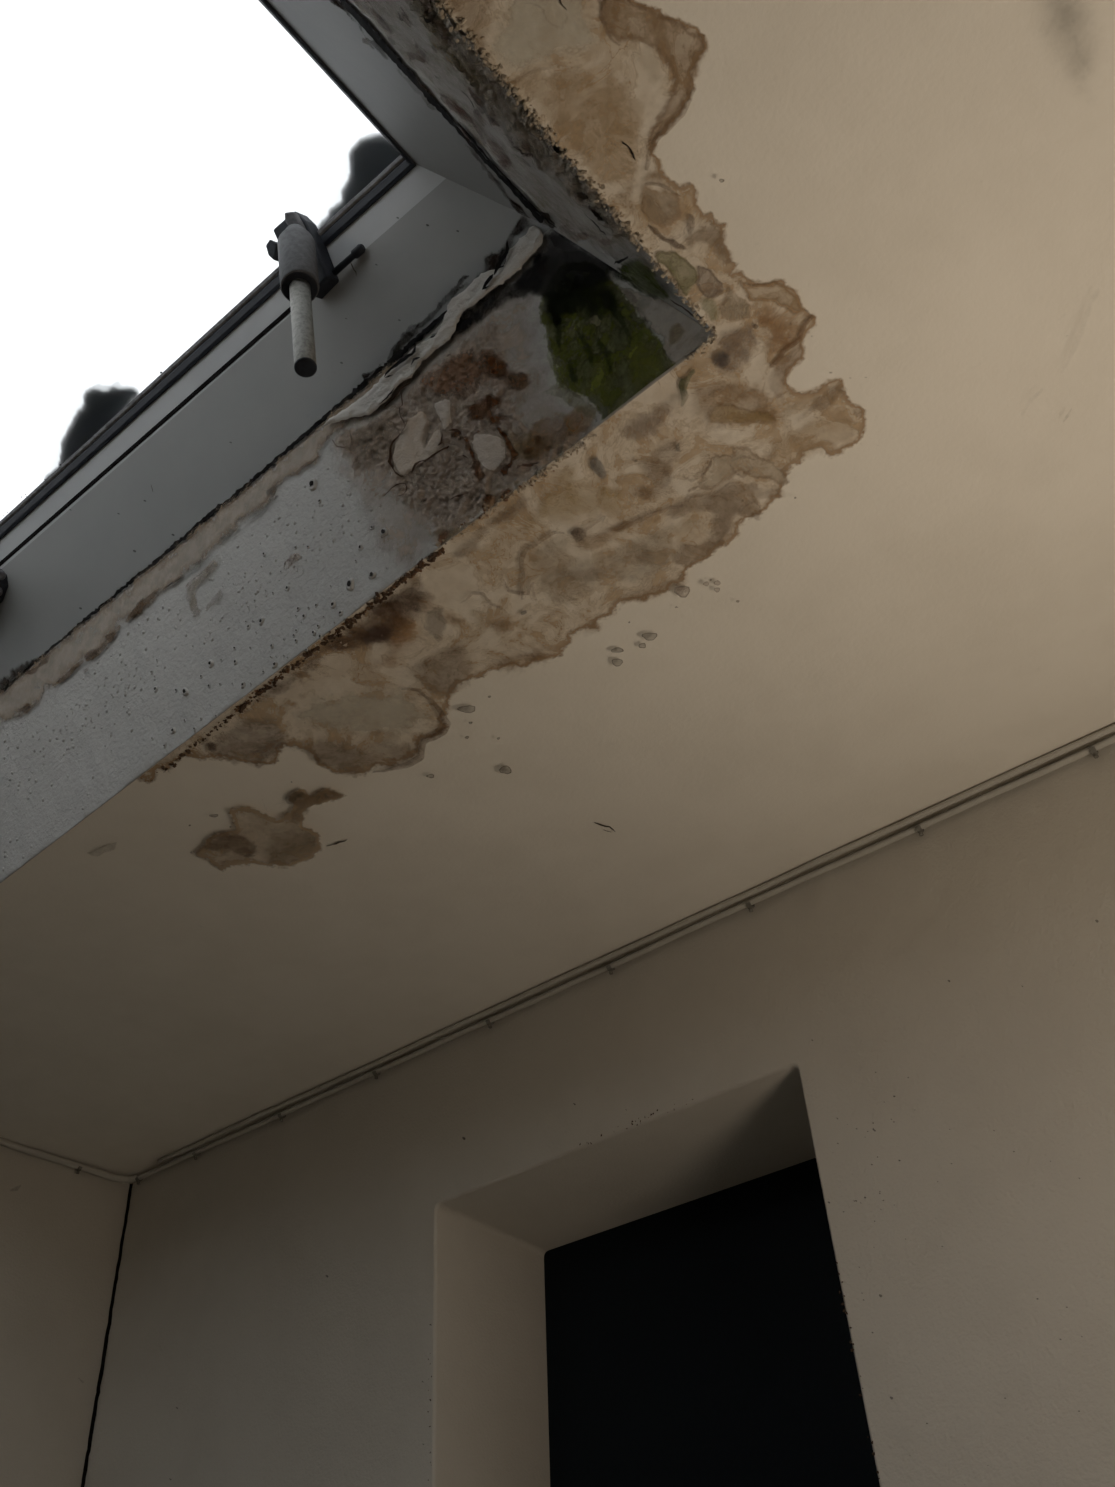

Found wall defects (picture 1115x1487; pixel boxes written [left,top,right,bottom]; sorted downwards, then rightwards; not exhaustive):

peeling [151,226,602,781]
leakage [0,0,866,871]
peeling [404,0,717,363]
crack [81,1183,133,1487]